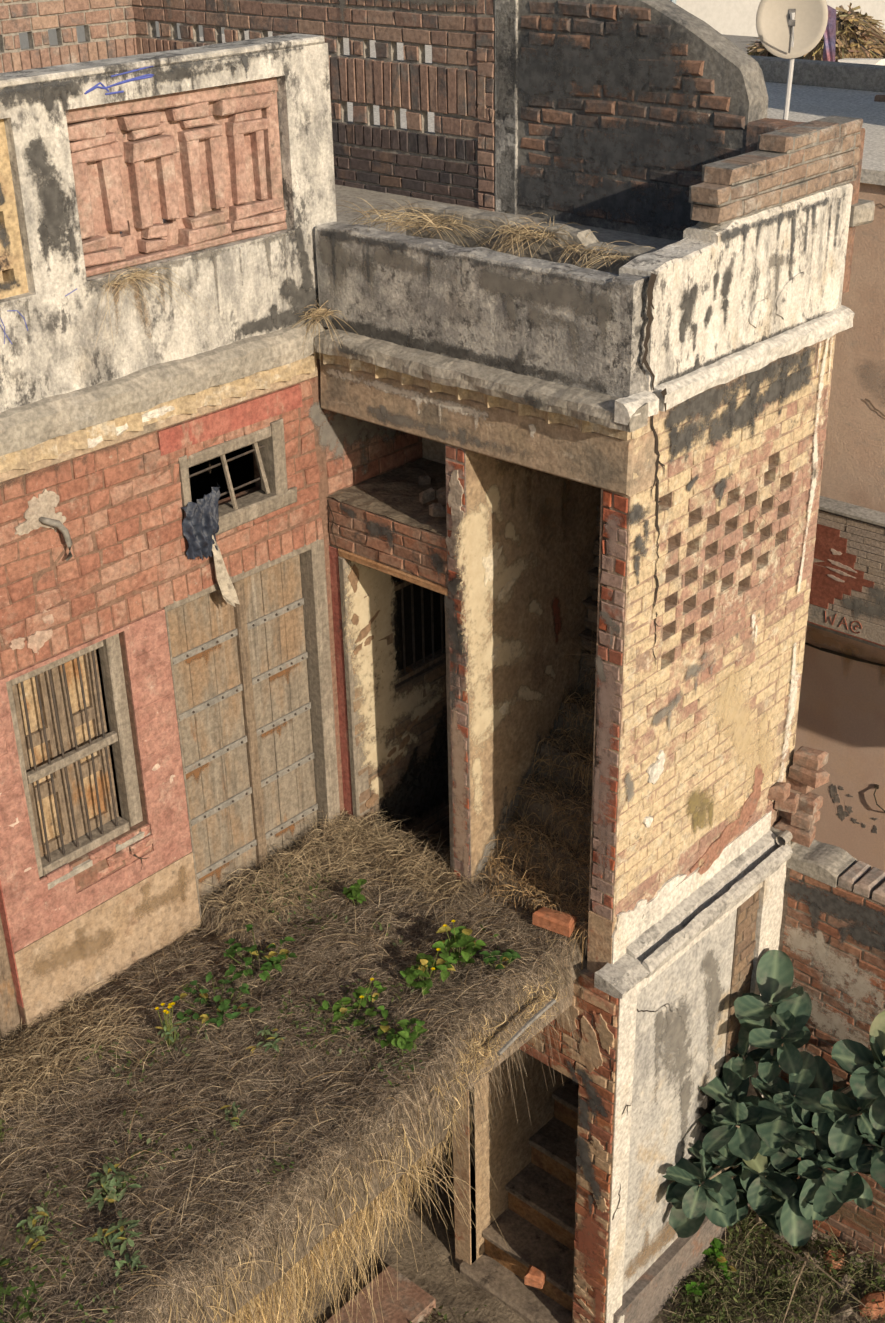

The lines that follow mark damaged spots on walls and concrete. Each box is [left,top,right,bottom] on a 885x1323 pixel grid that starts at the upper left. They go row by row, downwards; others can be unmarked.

damp [25,138,78,273]
damp [502,6,735,236]
damp [659,194,845,385]
peeling [15,488,66,535]
peeling [345,561,445,809]
peeling [445,484,545,814]
crack [641,273,667,666]
peeling [809,524,874,609]
flaking render [612,764,764,944]
flaking render [555,1005,614,1073]
damp [655,951,724,1158]
flaking render [575,1273,595,1323]